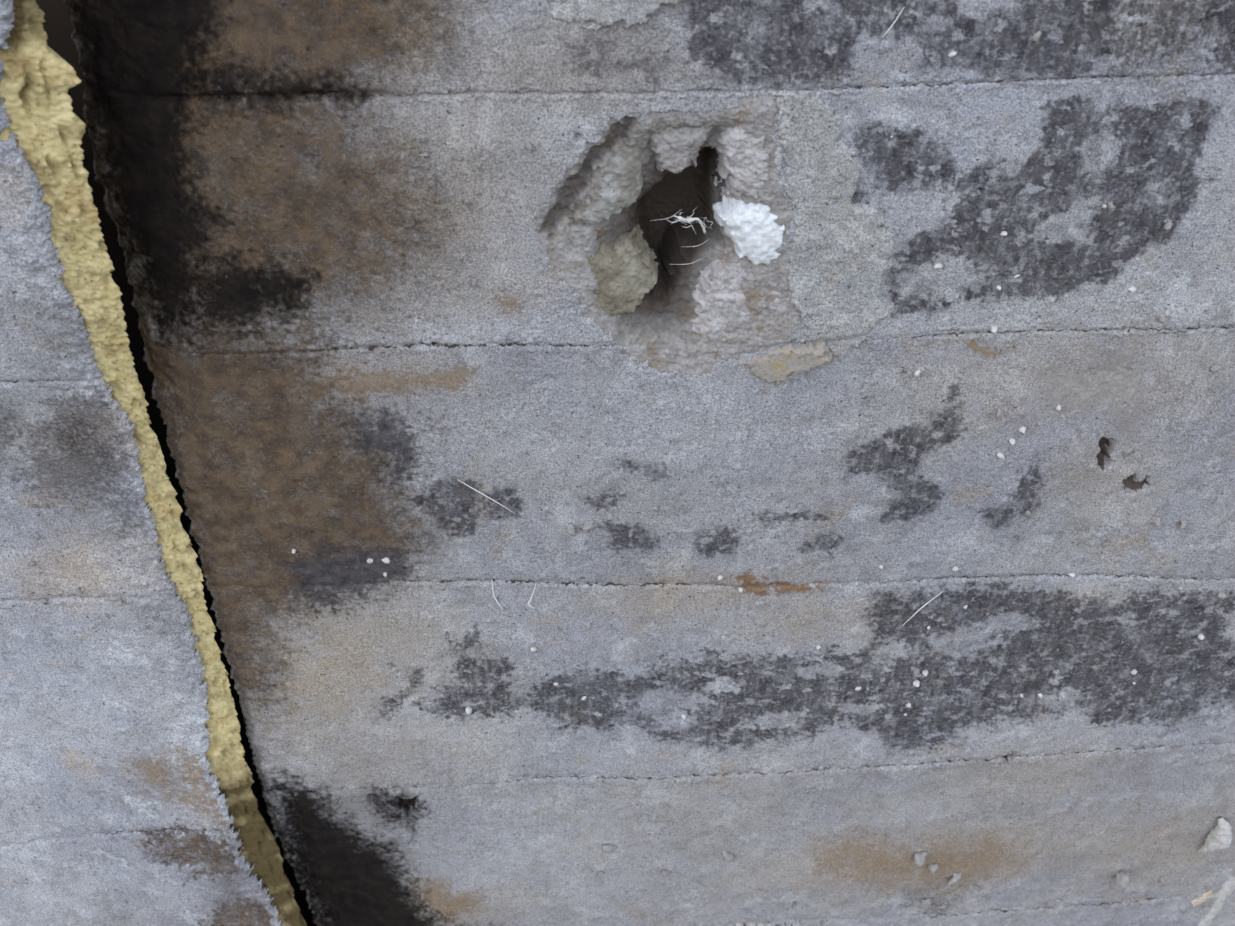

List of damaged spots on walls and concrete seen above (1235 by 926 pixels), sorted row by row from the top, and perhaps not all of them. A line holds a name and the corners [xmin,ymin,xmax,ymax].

flaking render [550,0,688,31]
leakage [572,40,668,86]
leakage [688,0,1235,88]
spalling [535,89,895,385]
leakage [852,96,1220,317]
leakage [71,0,521,707]
leakage [603,522,659,549]
leakage [696,528,738,557]
leakage [380,582,1235,756]
leakage [266,772,478,926]